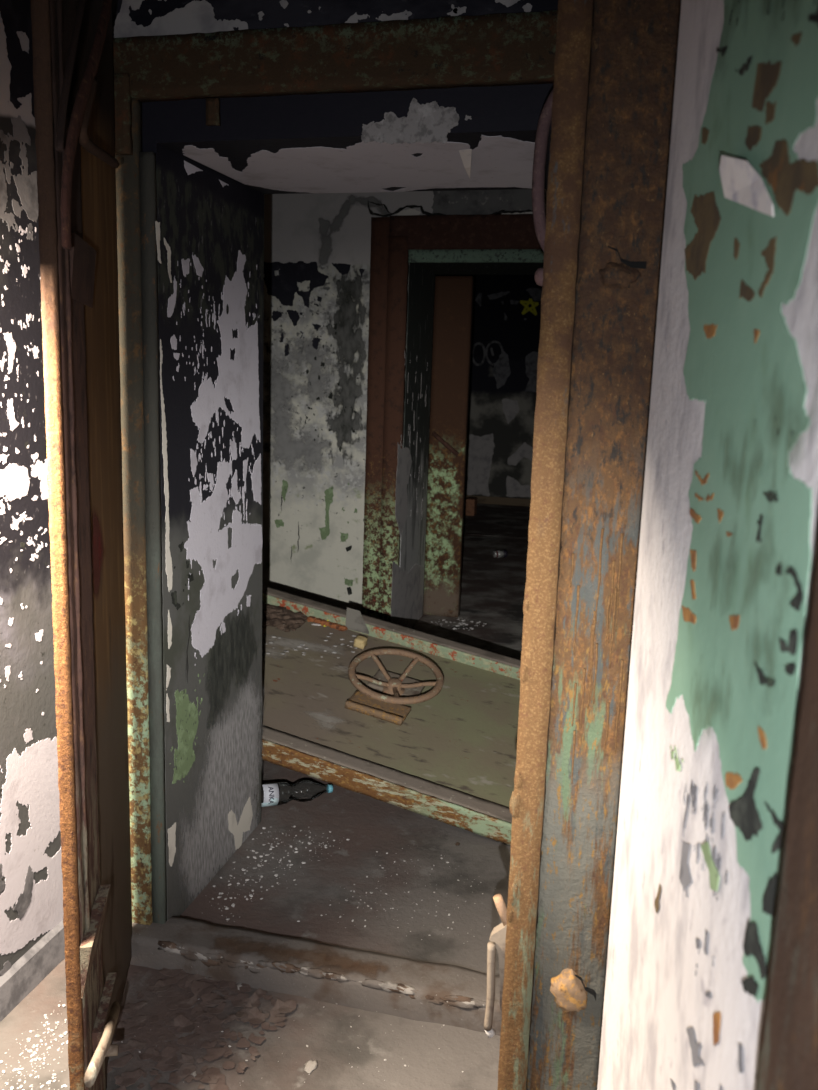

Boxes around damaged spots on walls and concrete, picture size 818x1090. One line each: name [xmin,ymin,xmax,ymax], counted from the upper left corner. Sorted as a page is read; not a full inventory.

peeling [113,0,270,38]
peeling [0,0,38,307]
peeling [182,98,535,193]
peeling [0,313,49,573]
peeling [155,221,365,659]
peeling [666,0,818,1002]
peeling [0,728,64,976]
peeling [168,822,176,867]
peeling [166,665,205,784]
corrosion [506,883,518,923]
corrosion [509,771,523,817]
corrosion [570,528,611,784]